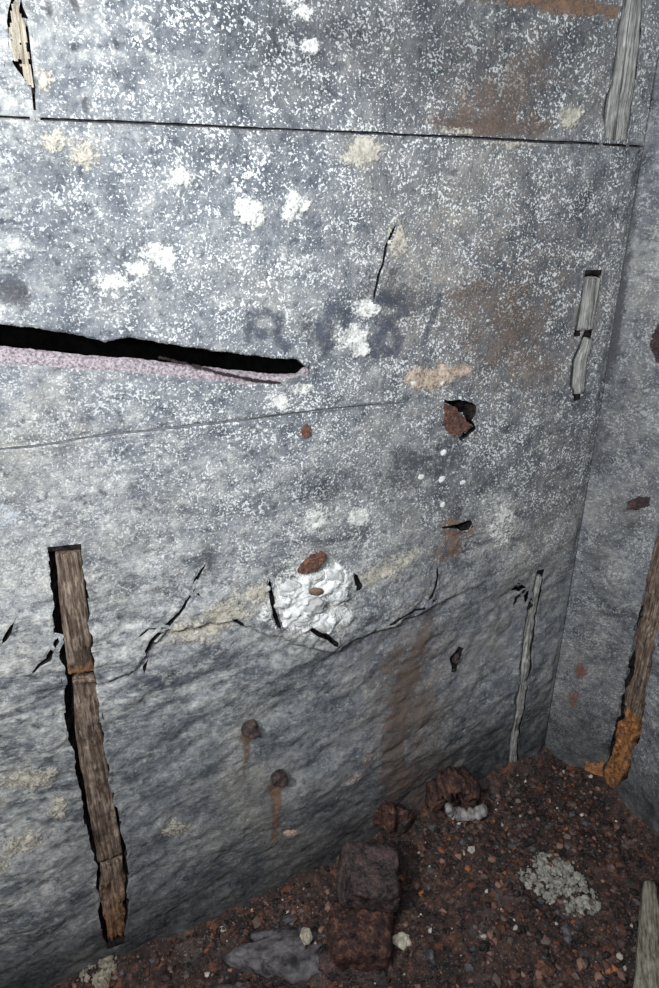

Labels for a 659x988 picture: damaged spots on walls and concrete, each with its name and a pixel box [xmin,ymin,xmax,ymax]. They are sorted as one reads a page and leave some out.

rust [496,0,620,19]
crack [566,270,605,402]
rust [649,324,659,362]
rust [442,403,473,435]
crack [0,617,21,648]
crack [126,559,211,679]
crack [231,575,342,650]
spalling [254,549,357,639]
crack [350,568,366,596]
crack [384,563,441,628]
crack [25,543,134,949]